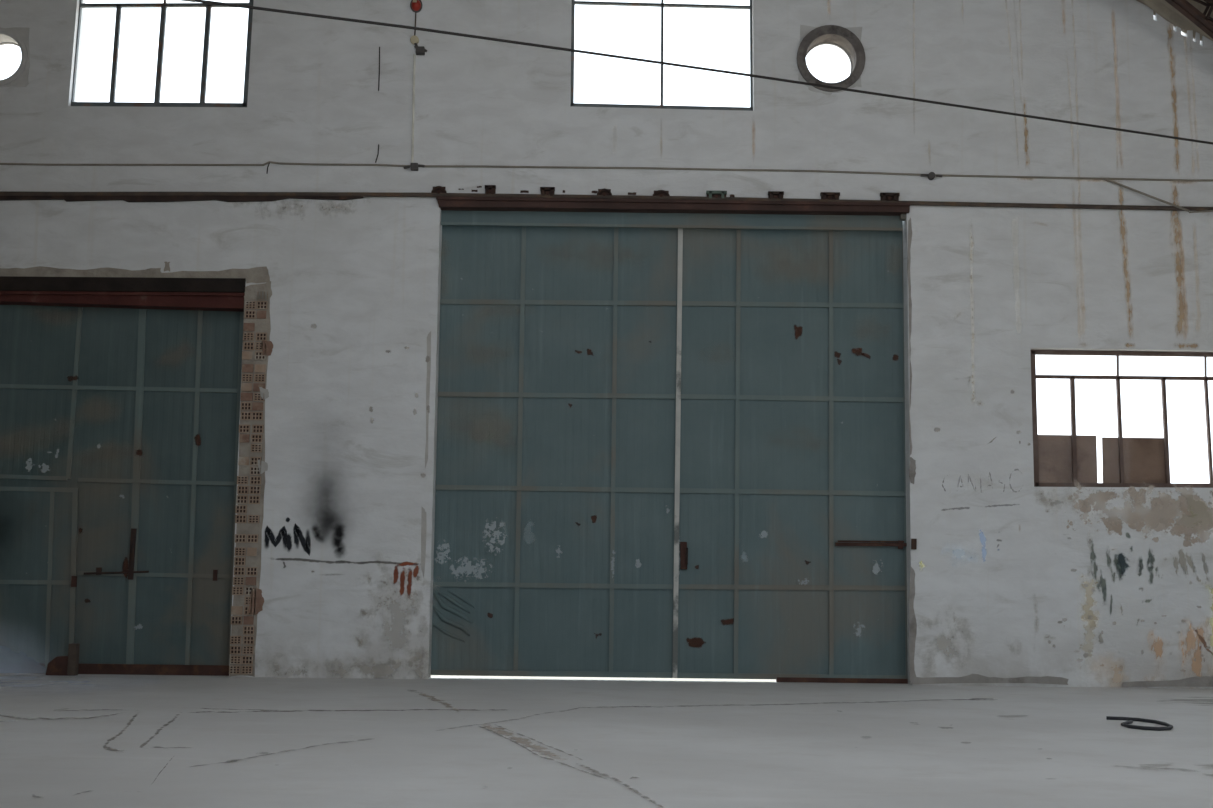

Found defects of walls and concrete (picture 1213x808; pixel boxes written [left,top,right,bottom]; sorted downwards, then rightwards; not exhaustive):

corrosion [1168,31,1179,167]
corrosion [1120,190,1130,321]
corrosion [1172,191,1197,348]
corrosion [835,348,871,365]
flaking render [0,262,273,677]
peeling [1067,486,1213,547]
corrosion [686,638,706,648]